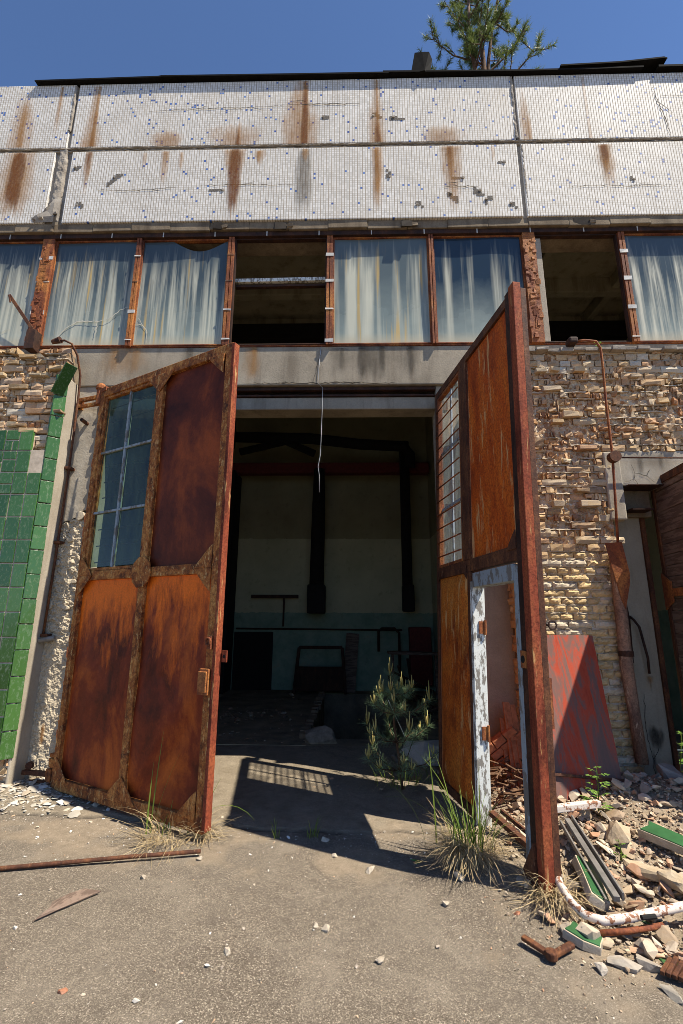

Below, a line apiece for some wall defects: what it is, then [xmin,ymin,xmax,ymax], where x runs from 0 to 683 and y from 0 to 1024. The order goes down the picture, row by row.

rust [6,153,26,209]
spalling [31,199,61,227]
rust [86,86,101,174]
rust [228,130,241,211]
rust [289,81,309,187]
rust [436,135,457,179]
spalling [447,176,493,205]
rust [600,144,609,169]